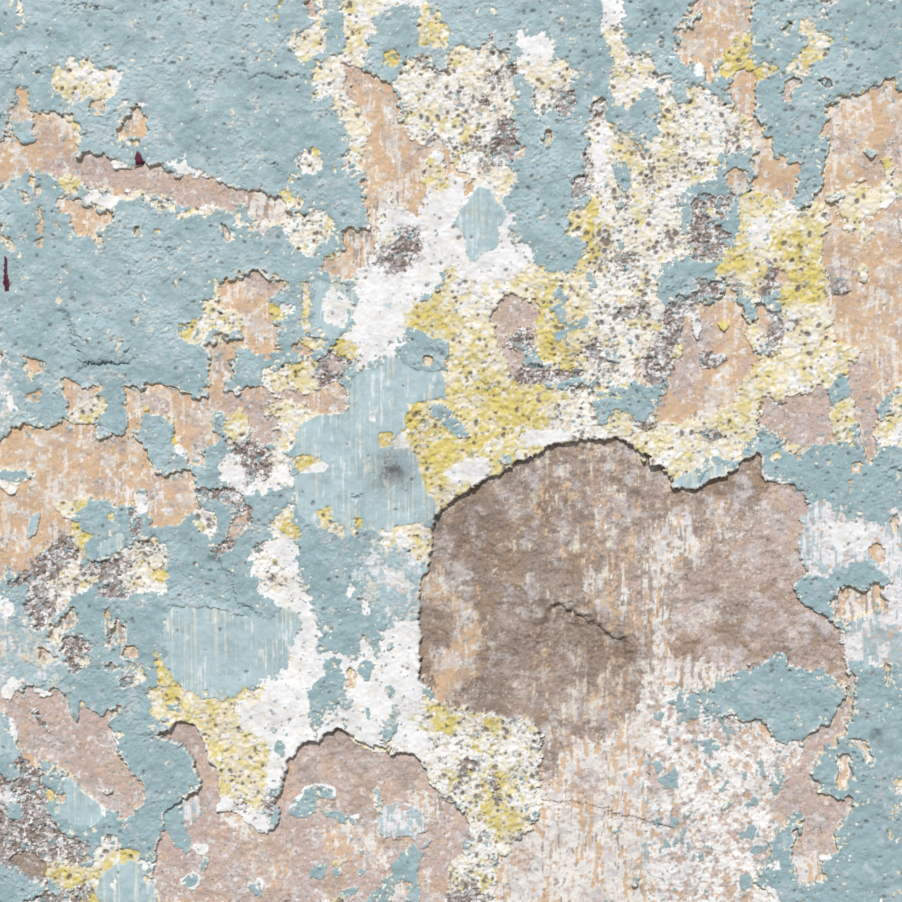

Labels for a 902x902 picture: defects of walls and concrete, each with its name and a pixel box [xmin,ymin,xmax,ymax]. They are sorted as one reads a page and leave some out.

spalling [0,505,546,902]
peeling [0,0,780,630]
spalling [440,79,902,902]
peeling [781,18,832,103]